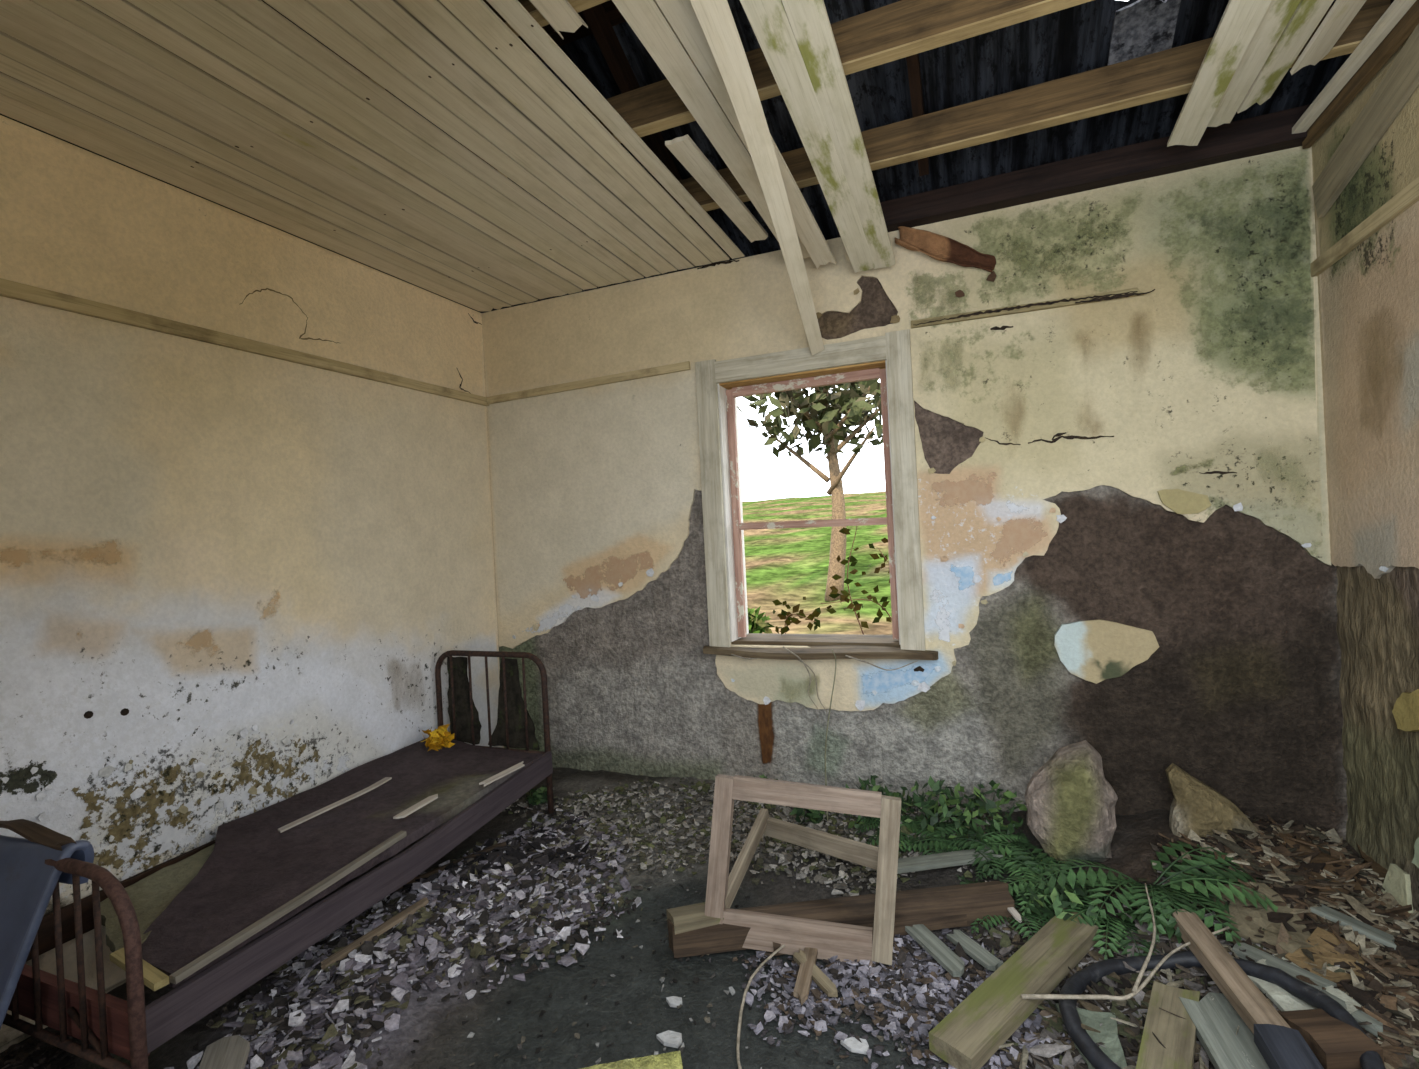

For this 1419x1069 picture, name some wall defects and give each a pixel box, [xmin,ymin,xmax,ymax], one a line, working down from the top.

spalling [816,276,900,340]
peeling [894,226,997,282]
crack [913,289,1155,330]
water stain [998,220,1124,273]
water stain [1202,191,1305,373]
water stain [139,636,310,720]
water stain [374,629,447,732]
spalling [499,401,1419,913]